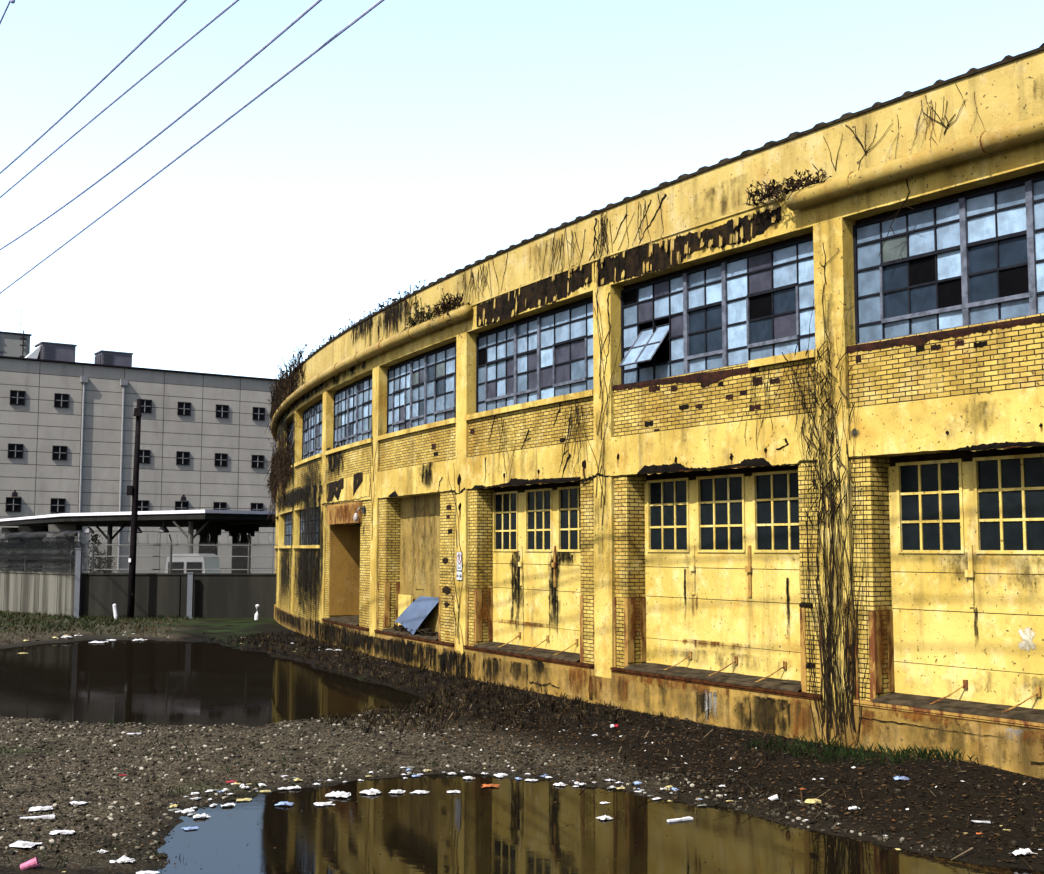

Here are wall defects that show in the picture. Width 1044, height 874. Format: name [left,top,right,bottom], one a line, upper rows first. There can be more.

flaking render [476,206,781,327]
leakage [275,358,544,679]
leakage [549,552,573,642]
rust [569,667,601,693]
rust [878,606,891,674]